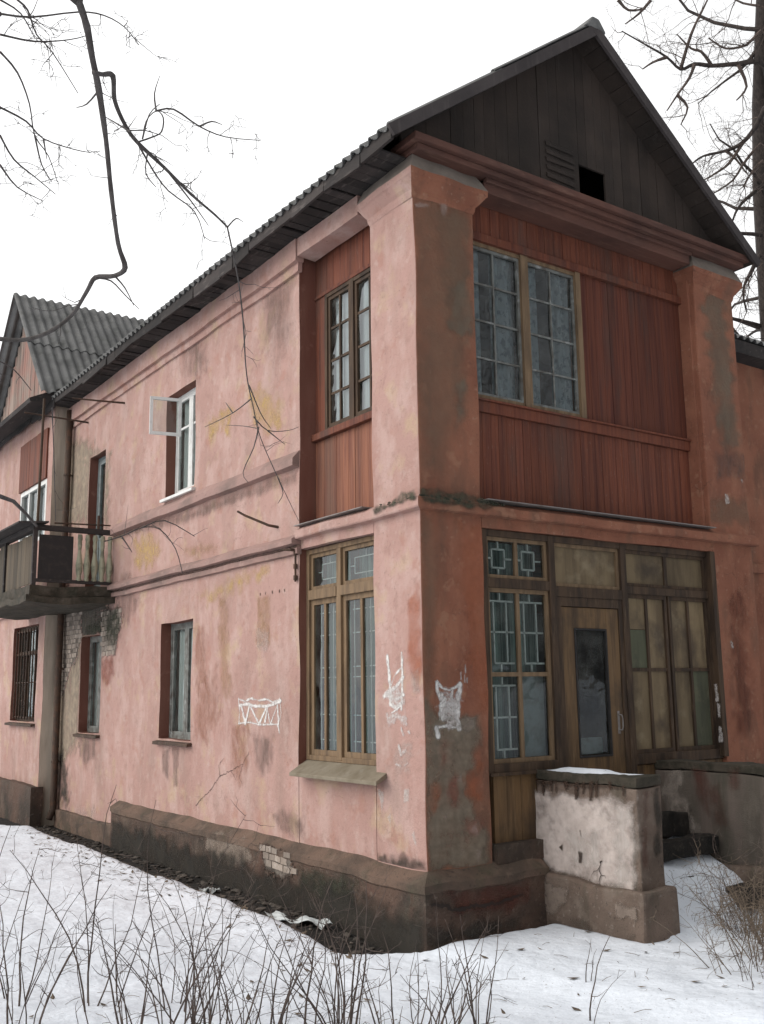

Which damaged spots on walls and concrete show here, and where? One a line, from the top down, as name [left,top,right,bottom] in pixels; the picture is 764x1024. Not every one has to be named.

flaking render [61,606,122,697]
leakage [536,780,624,801]
flaking render [206,834,298,881]
leakage [110,821,515,954]